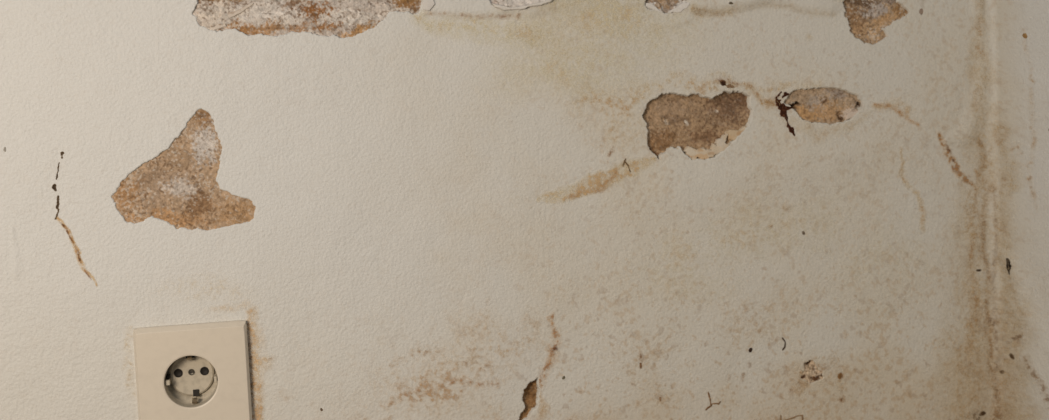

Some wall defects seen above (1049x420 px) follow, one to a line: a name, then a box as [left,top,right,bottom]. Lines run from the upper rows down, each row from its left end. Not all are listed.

flaking render [193,0,435,38]
flaking render [645,0,690,13]
flaking render [843,0,923,44]
flaking render [642,84,750,160]
flaking render [784,88,861,124]
crack [52,151,64,220]
flaking render [112,109,256,230]
flaking render [519,380,537,420]